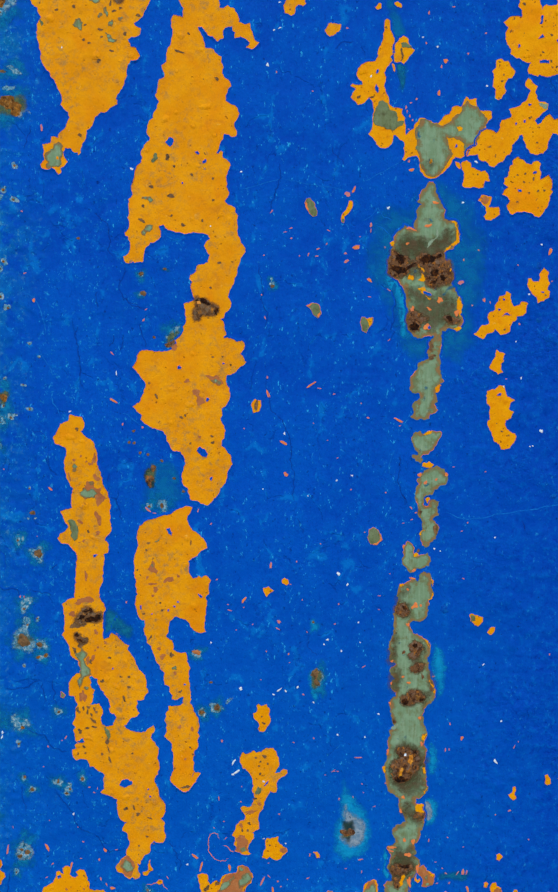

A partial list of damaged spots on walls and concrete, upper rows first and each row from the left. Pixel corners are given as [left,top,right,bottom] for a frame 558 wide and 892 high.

peeling [281,0,308,18]
peeling [28,0,153,177]
peeling [50,0,262,889]
peeling [348,0,558,892]
peeling [262,577,290,598]
peeling [251,701,273,734]
peeling [195,745,290,892]
rust [335,788,370,859]
peeling [40,863,108,892]